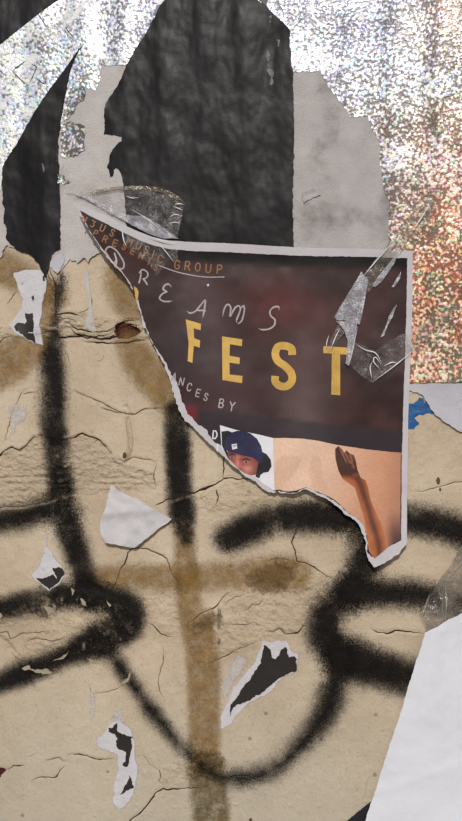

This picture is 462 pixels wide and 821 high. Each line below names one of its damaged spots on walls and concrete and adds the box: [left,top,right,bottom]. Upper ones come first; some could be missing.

spalling [39,312,150,341]
crack [0,391,34,456]
crack [104,548,182,587]
crack [267,499,334,579]
crack [7,754,112,781]
crack [129,755,204,821]